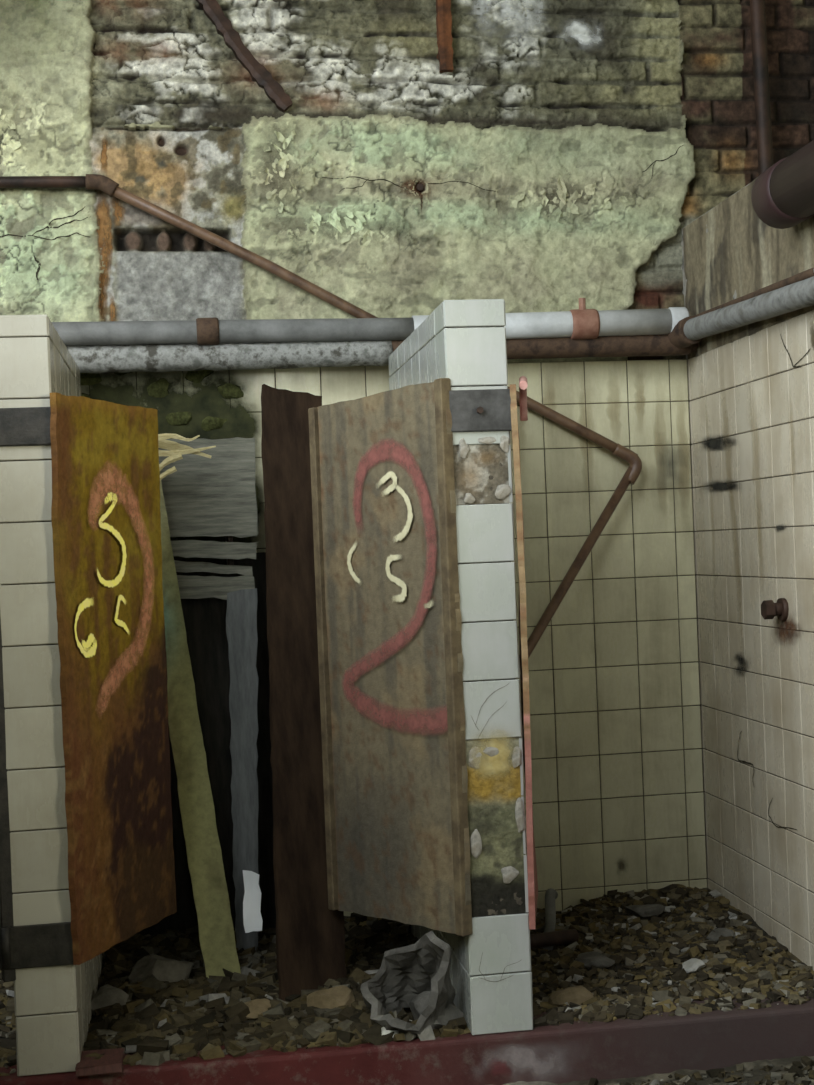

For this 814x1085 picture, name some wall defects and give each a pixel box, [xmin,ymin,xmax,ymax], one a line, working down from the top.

spalling [88,0,759,322]
spalling [765,0,814,165]
corrosion [96,197,124,321]